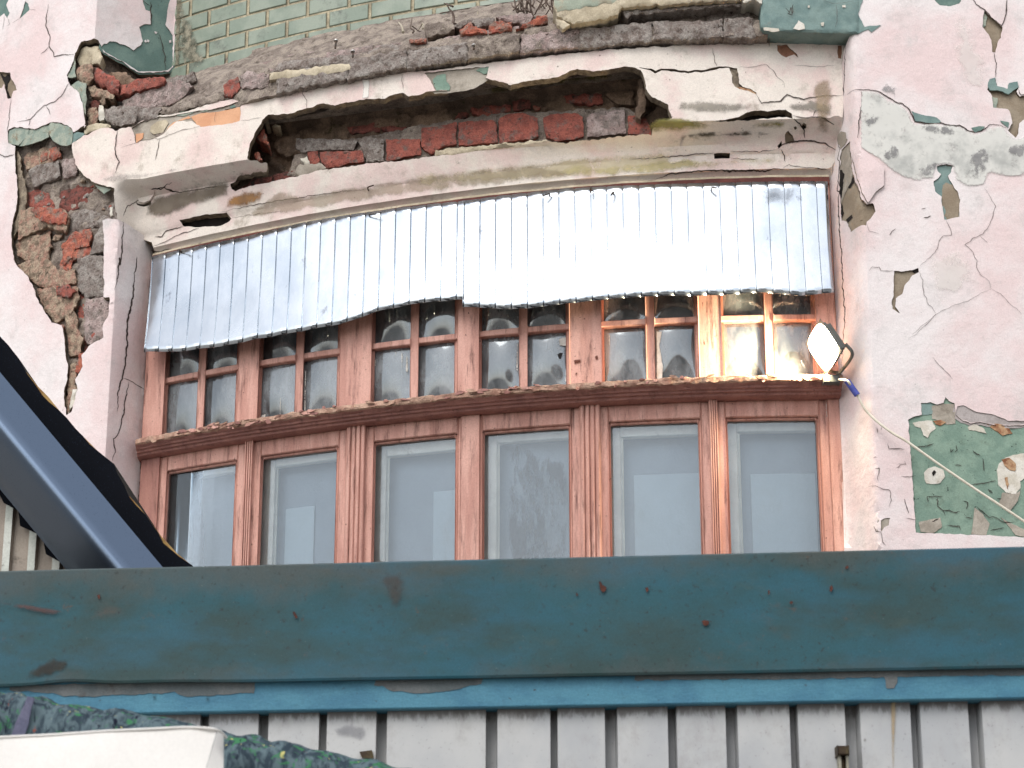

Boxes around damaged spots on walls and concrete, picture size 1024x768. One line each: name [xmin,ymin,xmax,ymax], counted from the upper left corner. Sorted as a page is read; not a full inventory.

crack [3,9,73,57]
peeling [842,0,881,34]
spalling [987,78,1024,138]
spalling [8,0,779,414]
crack [637,0,1021,368]
spalling [837,131,875,232]
peeling [934,165,960,220]
crack [113,184,364,457]
peeling [792,374,826,382]
peeling [172,415,280,437]
peeling [299,405,349,417]
peeling [908,398,1024,538]